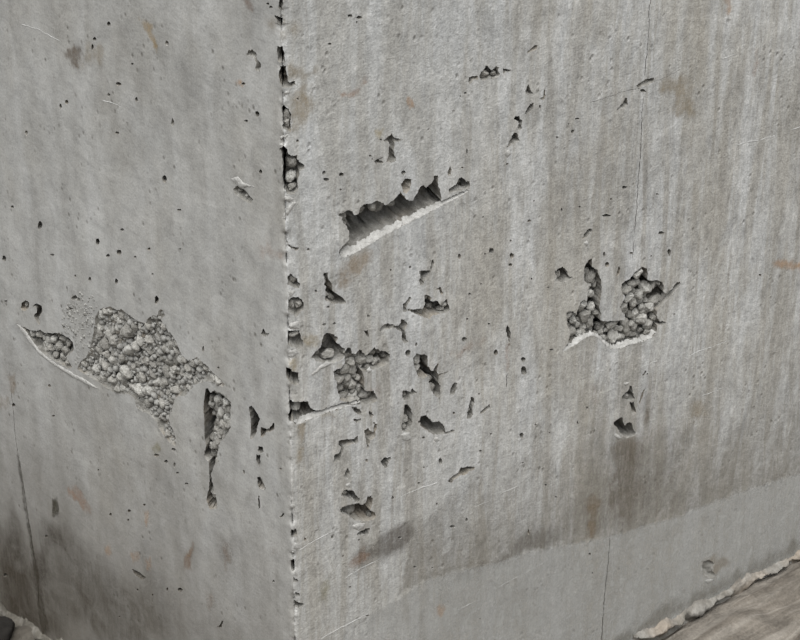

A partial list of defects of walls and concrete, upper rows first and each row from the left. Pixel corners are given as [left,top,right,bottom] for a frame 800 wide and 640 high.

peeling [279,106,304,219]
spalling [338,167,471,258]
spalling [21,300,42,325]
peeling [17,324,98,389]